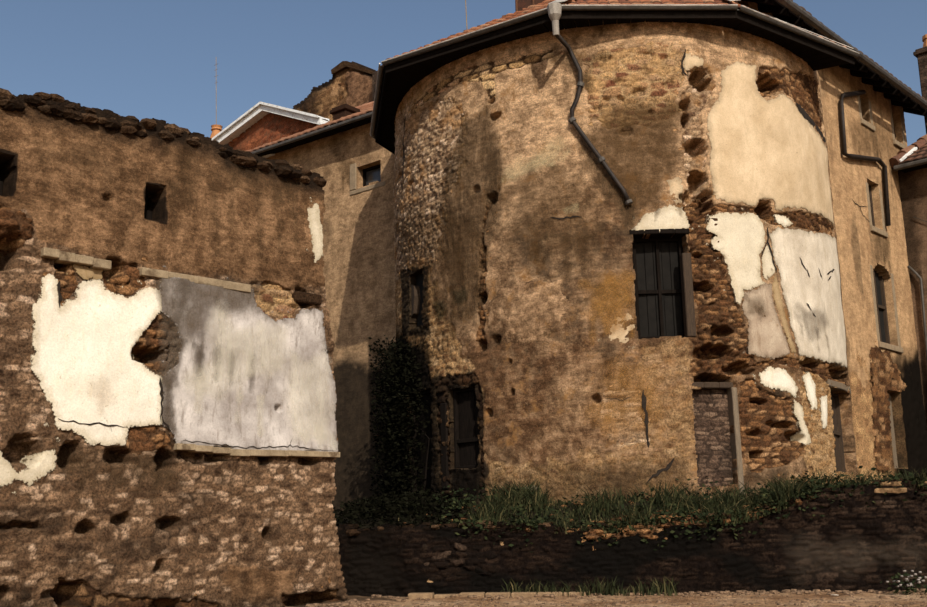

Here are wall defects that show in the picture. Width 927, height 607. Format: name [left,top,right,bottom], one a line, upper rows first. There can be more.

water stain [443,107,500,317]
peeling [575,42,850,477]
peeling [0,257,338,495]
water stain [146,277,254,396]
crack [607,390,650,448]
crack [647,458,674,483]
spalling [869,341,907,473]